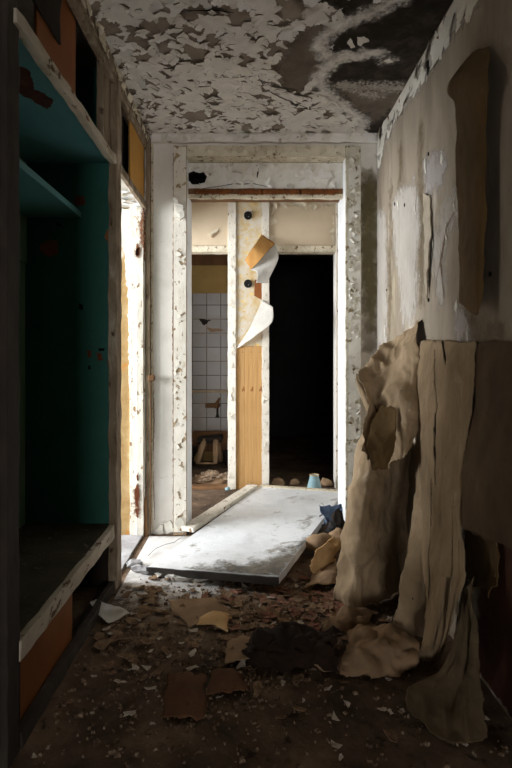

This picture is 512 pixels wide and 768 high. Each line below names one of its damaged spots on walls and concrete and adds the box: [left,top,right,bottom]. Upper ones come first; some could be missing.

peeling [81,0,368,141]
peeling [376,0,478,174]
peeling [154,145,361,534]
peeling [377,151,447,349]
peeling [431,189,458,305]
peeling [454,299,471,342]
rust [133,474,141,518]
peeling [477,543,512,717]